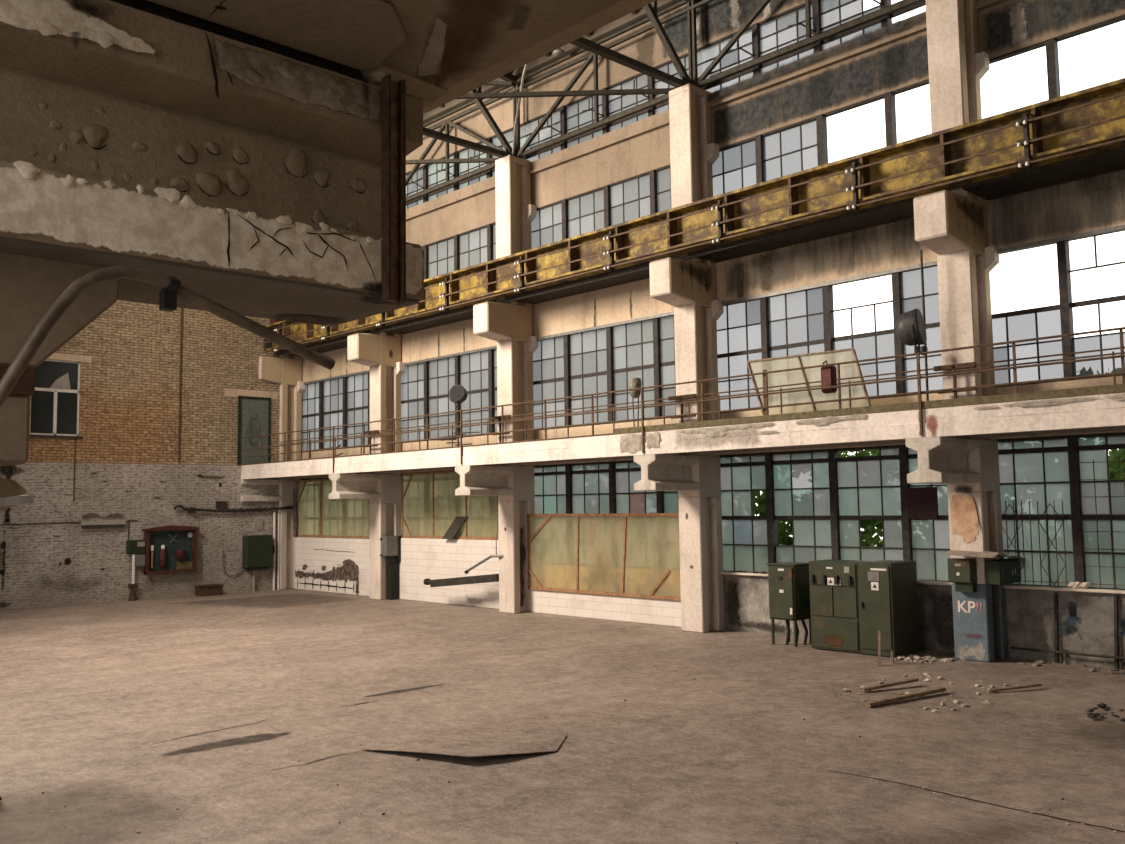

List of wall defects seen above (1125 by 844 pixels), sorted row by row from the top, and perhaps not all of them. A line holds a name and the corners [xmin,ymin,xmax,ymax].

peeling [0,0,155,54]
crack [205,0,233,99]
spalling [215,39,381,122]
damp [708,11,929,144]
peeling [0,161,382,289]
crack [227,211,376,280]
peeling [406,244,423,295]
damp [957,169,1125,245]
peeling [951,495,978,543]
spalling [295,559,359,595]
peeling [1043,595,1125,648]